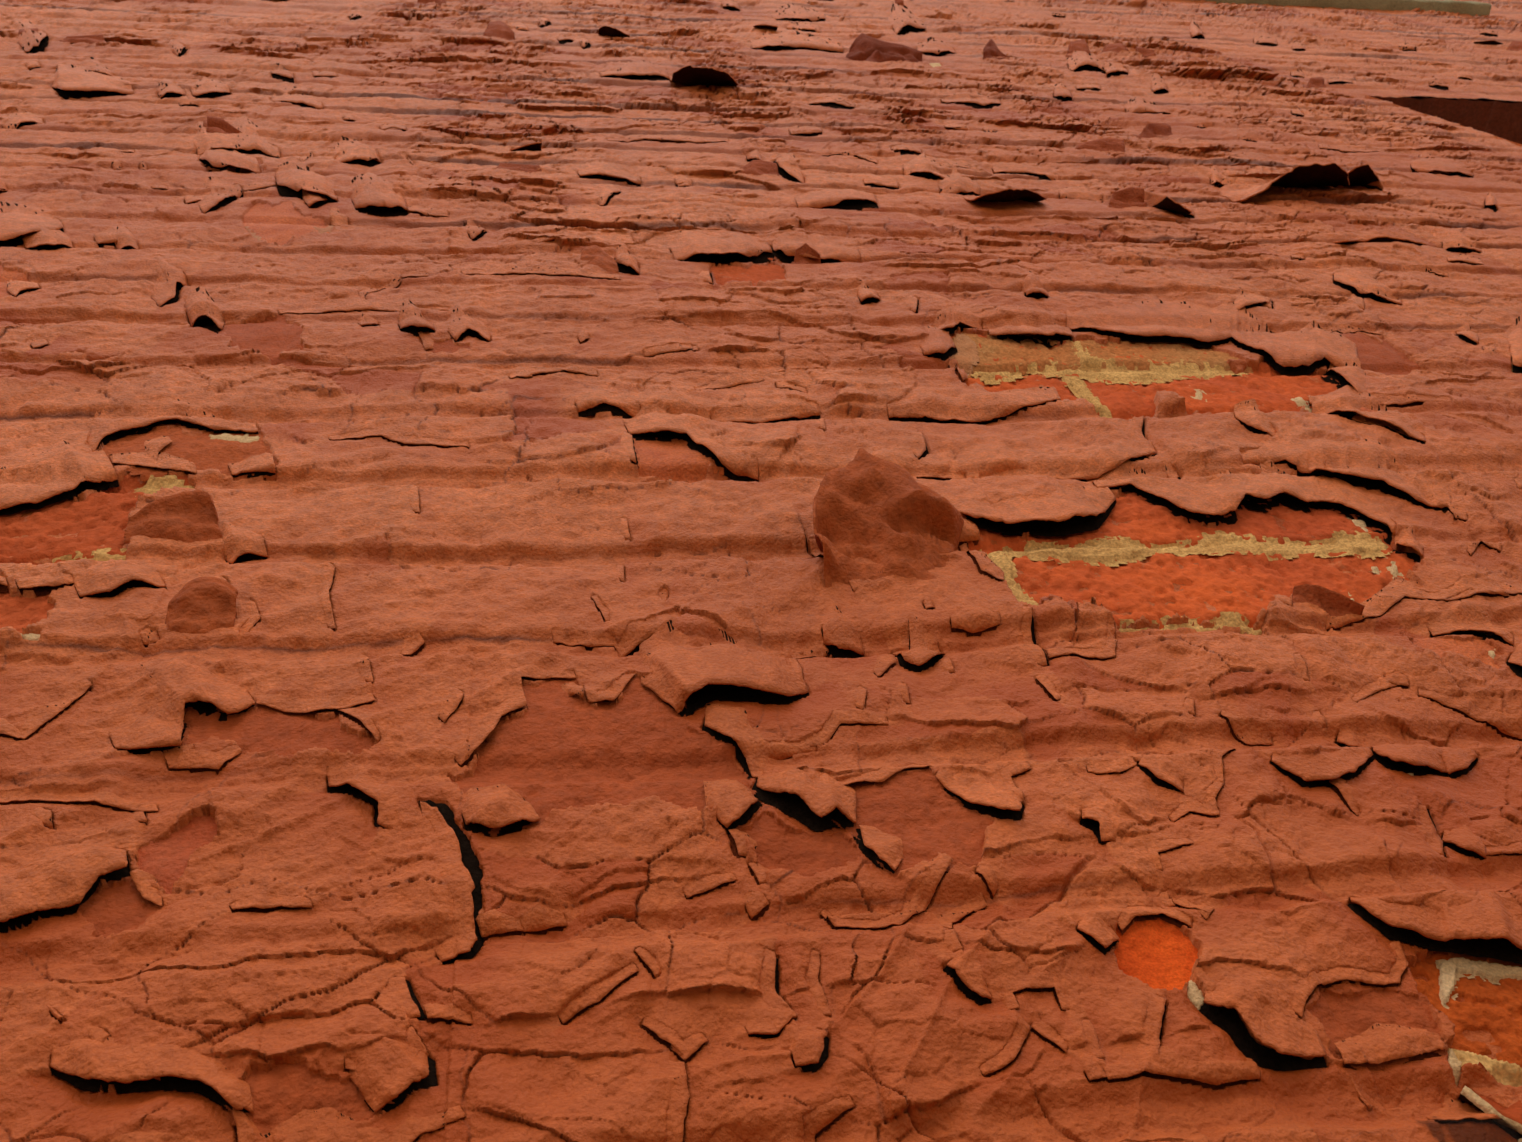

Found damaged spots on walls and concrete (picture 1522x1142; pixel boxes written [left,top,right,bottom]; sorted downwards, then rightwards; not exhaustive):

crack [15,559,166,599]
flaking render [0,397,278,641]
crack [326,759,399,830]
peeling [419,618,1031,964]
crack [768,596,1061,760]
flaking render [788,299,1426,662]
crack [1183,671,1522,860]
crack [1234,393,1522,632]
crack [46,1004,466,1142]
crack [745,852,1107,1142]
flaking render [1076,890,1522,1142]
crack [1334,1023,1446,1109]